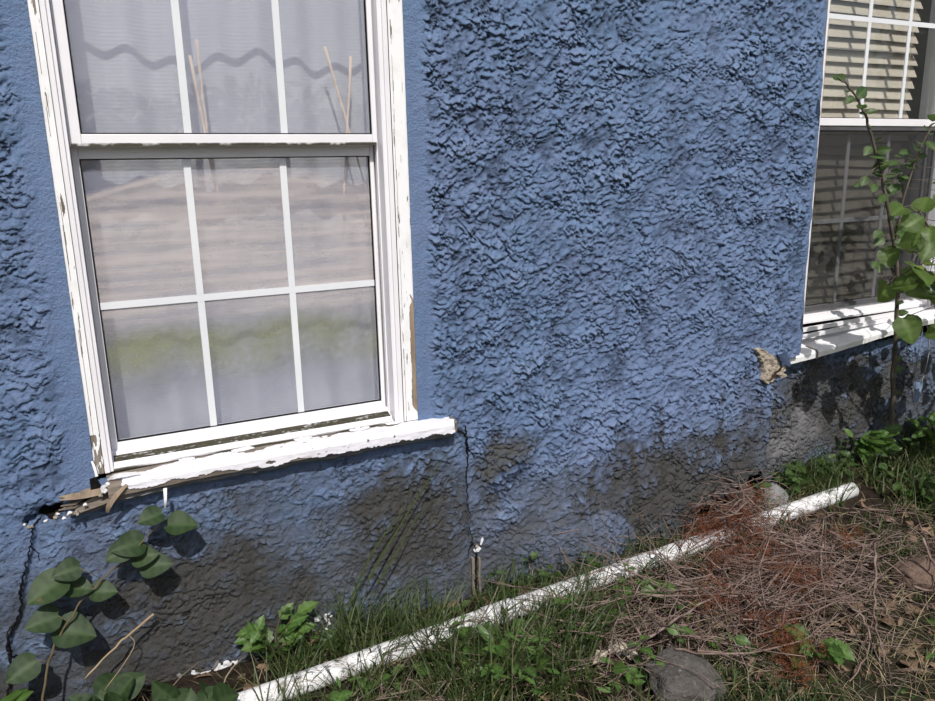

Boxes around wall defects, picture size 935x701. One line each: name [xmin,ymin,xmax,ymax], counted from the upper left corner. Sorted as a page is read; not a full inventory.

peeling [27,0,103,474]
peeling [98,0,455,508]
spalling [753,347,792,384]
crack [5,508,49,696]
damp [352,458,470,577]
crack [457,426,478,597]
damp [478,435,531,497]